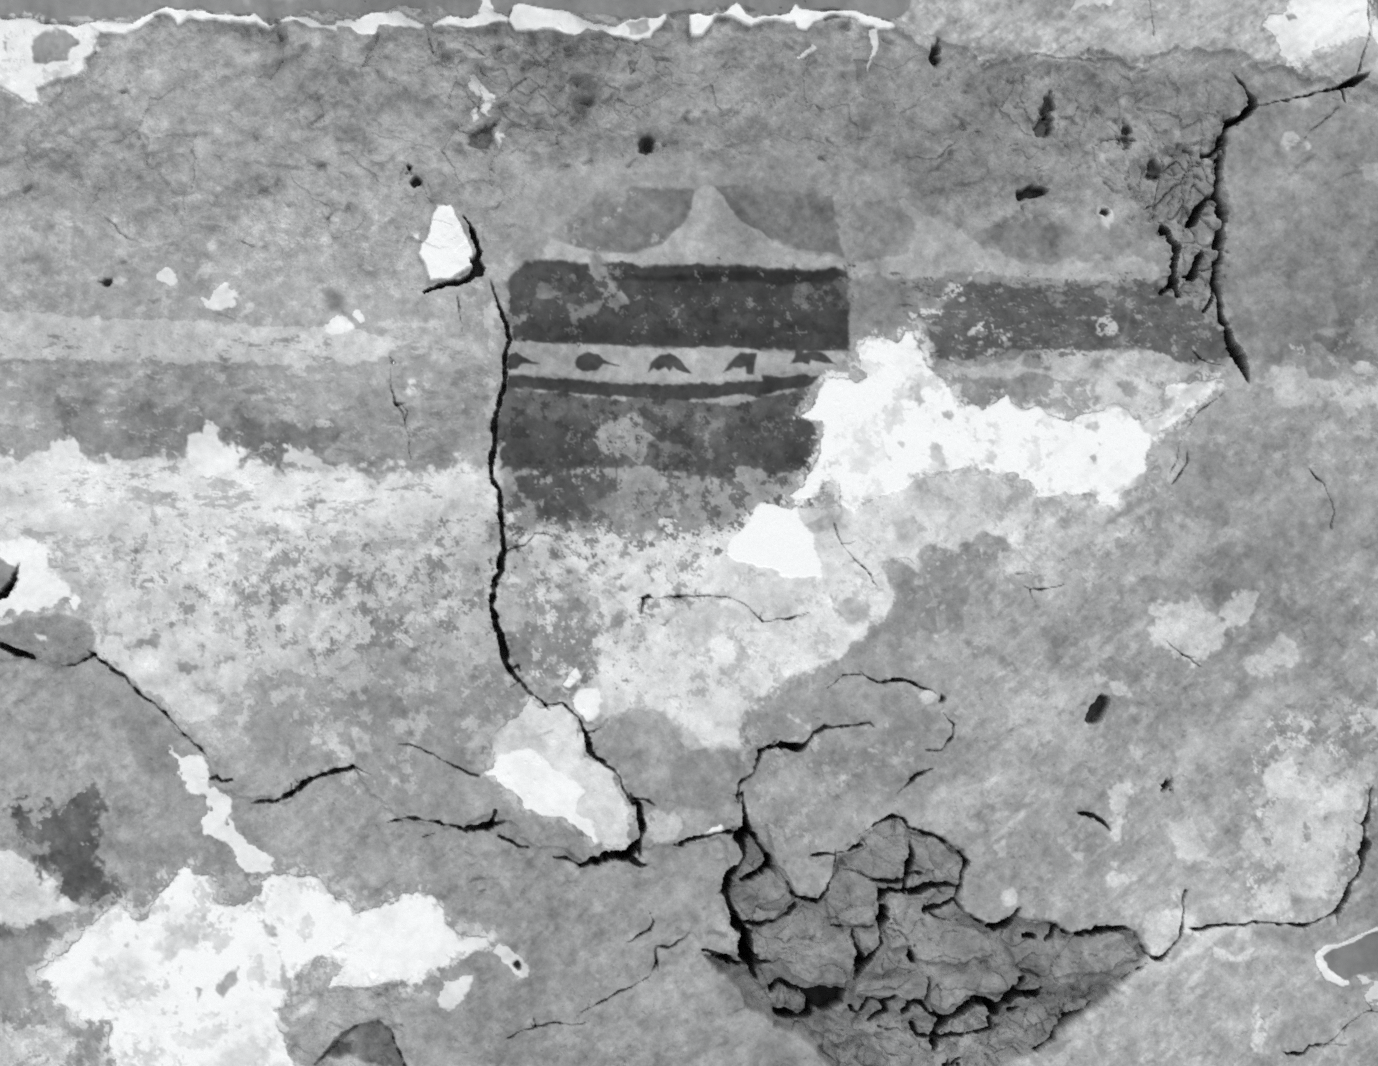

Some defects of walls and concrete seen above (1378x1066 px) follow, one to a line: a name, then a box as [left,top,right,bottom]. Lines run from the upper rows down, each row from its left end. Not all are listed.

spalling [0,0,1378,336]
crack [0,562,20,600]
crack [0,642,373,805]
peeling [0,263,1218,849]
crack [387,216,1378,1066]
peeling [36,866,530,1066]
spalling [704,819,1147,1066]